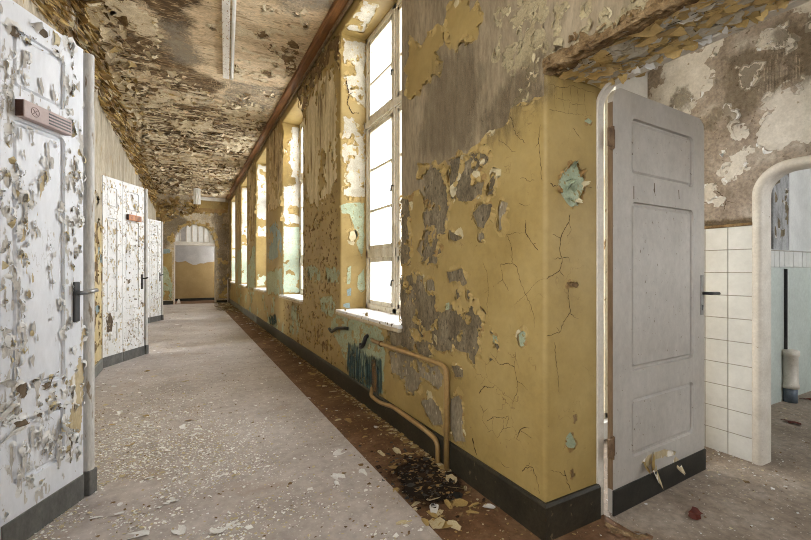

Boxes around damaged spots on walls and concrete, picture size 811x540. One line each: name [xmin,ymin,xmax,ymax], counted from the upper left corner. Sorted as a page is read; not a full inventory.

peeling [755,1,811,55]
peeling [704,75,811,207]
peeling [0,0,791,433]
peeling [0,140,88,505]
crack [485,203,578,386]
peeling [449,362,466,446]
crack [472,386,531,455]